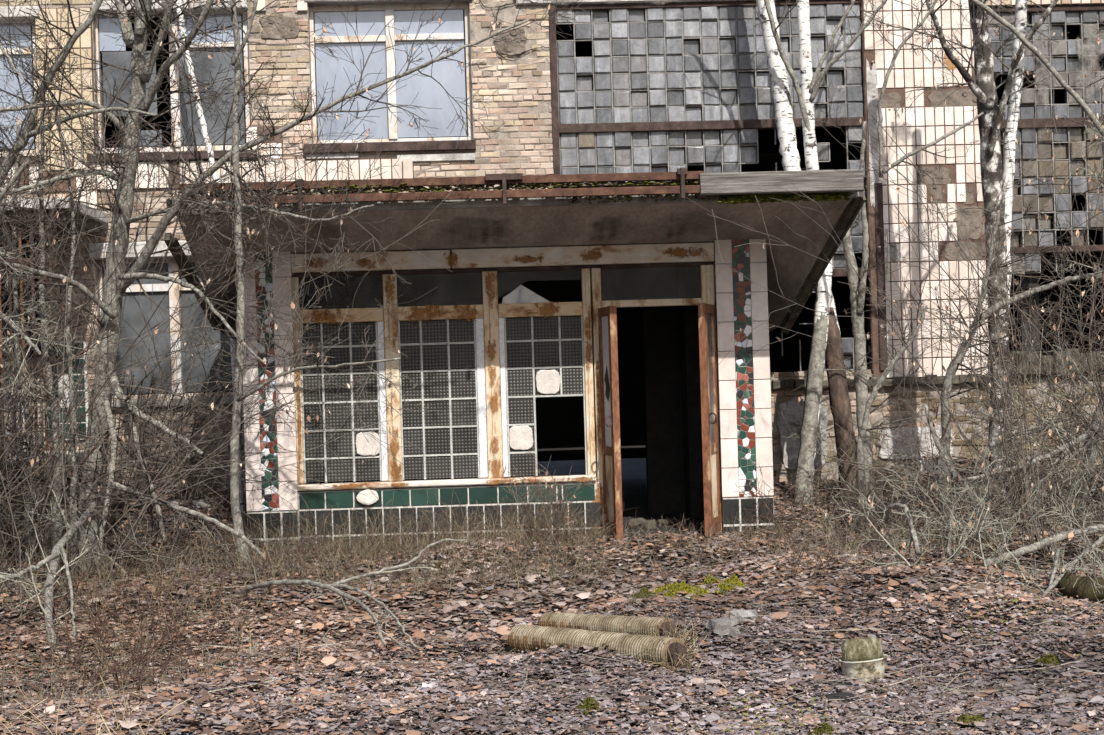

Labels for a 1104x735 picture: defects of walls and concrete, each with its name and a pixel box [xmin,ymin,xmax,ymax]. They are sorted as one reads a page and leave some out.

spalling [928,89,977,111]
spalling [917,167,951,205]
spalling [944,187,985,260]
rust [513,255,544,263]
rust [583,248,602,261]
rust [663,247,707,258]
rust [487,341,498,413]
rust [389,426,408,487]
rust [487,436,511,485]